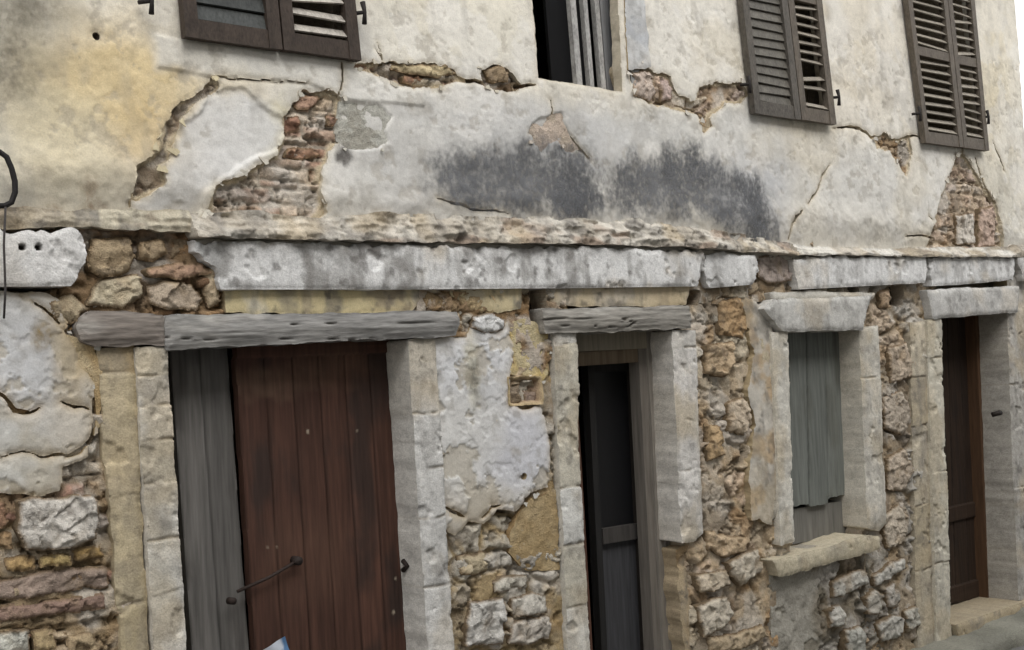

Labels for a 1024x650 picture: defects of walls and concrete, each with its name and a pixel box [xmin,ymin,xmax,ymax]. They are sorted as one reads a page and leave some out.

flaking render [128,75,220,207]
flaking render [201,89,391,218]
flaking render [348,55,531,93]
water stain [434,139,602,220]
flaking render [627,61,748,133]
flaking render [905,151,1001,248]
flaking render [414,289,567,650]